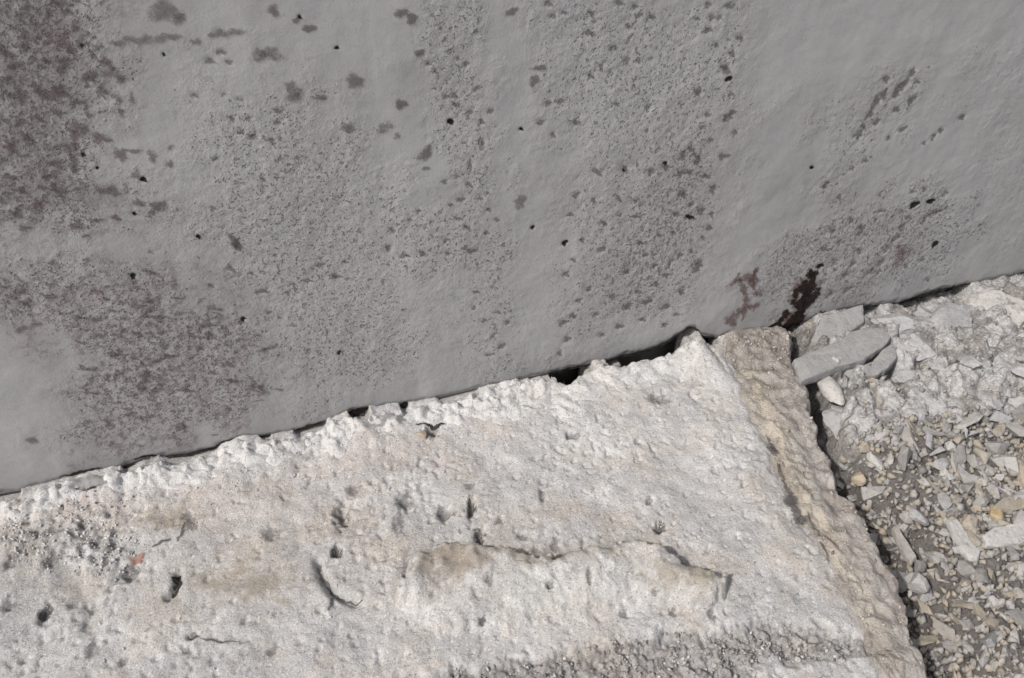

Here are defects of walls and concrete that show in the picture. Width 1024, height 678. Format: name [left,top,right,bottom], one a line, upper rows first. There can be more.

spalling [648,147,715,194]
spalling [637,240,702,286]
spalling [609,290,680,327]
rust [726,268,762,327]
rust [769,269,826,331]